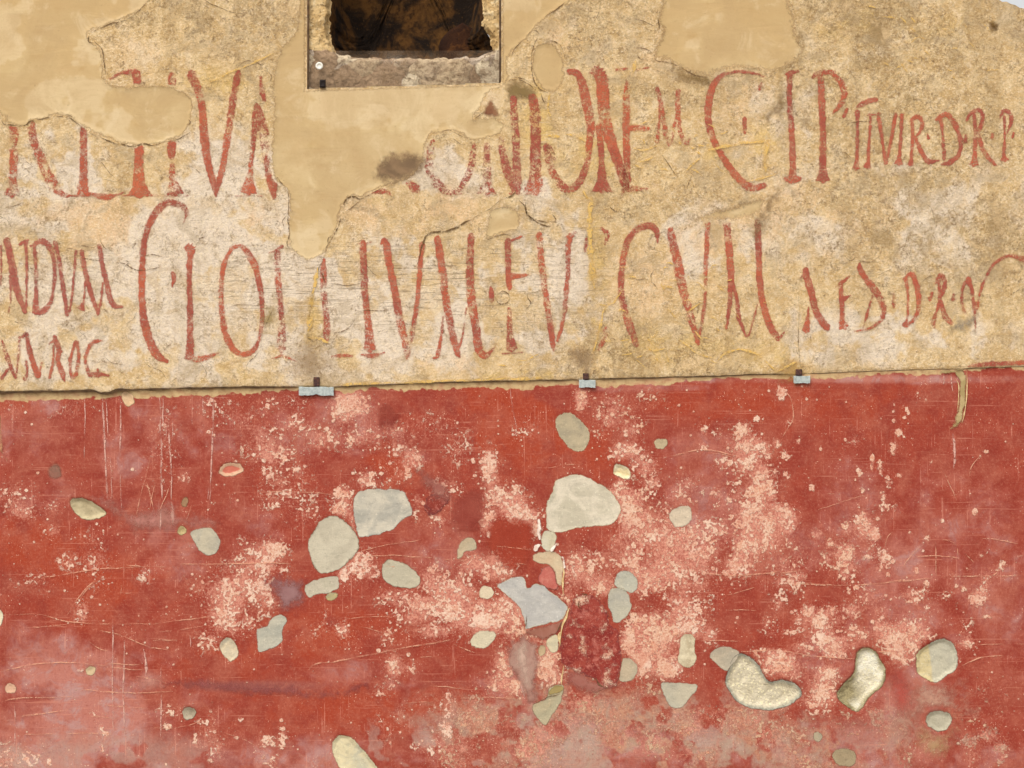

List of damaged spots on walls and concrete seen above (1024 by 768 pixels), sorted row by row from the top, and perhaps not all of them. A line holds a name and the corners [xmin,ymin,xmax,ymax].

peeling [203,398,235,447]
peeling [216,394,424,523]
peeling [762,385,787,400]
spalling [56,498,122,624]
peeling [177,535,292,661]
peeling [339,547,380,585]
crack [534,568,587,704]
spalling [361,390,1017,768]